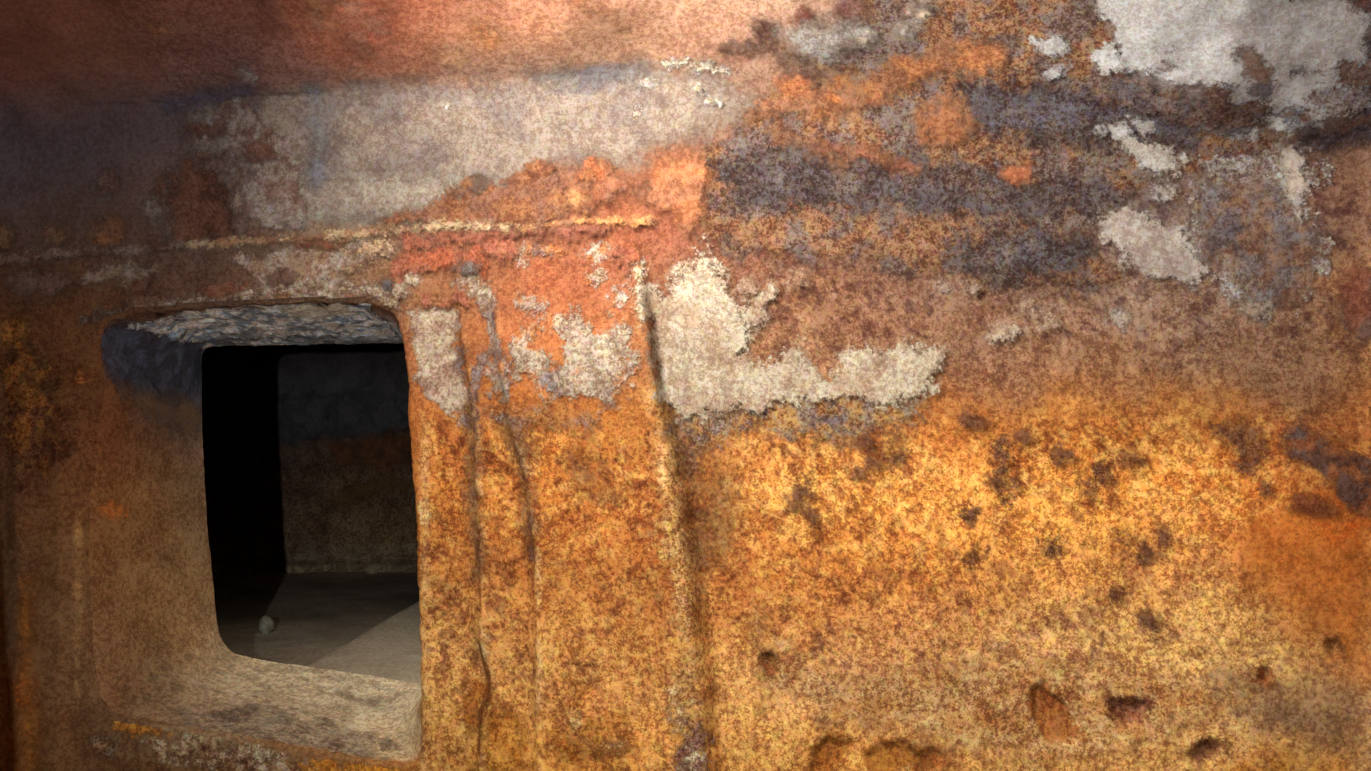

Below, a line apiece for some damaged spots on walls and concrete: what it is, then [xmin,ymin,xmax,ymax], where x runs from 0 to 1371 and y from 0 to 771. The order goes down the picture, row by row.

water stain [0,0,1371,309]
crack [476,643,512,751]